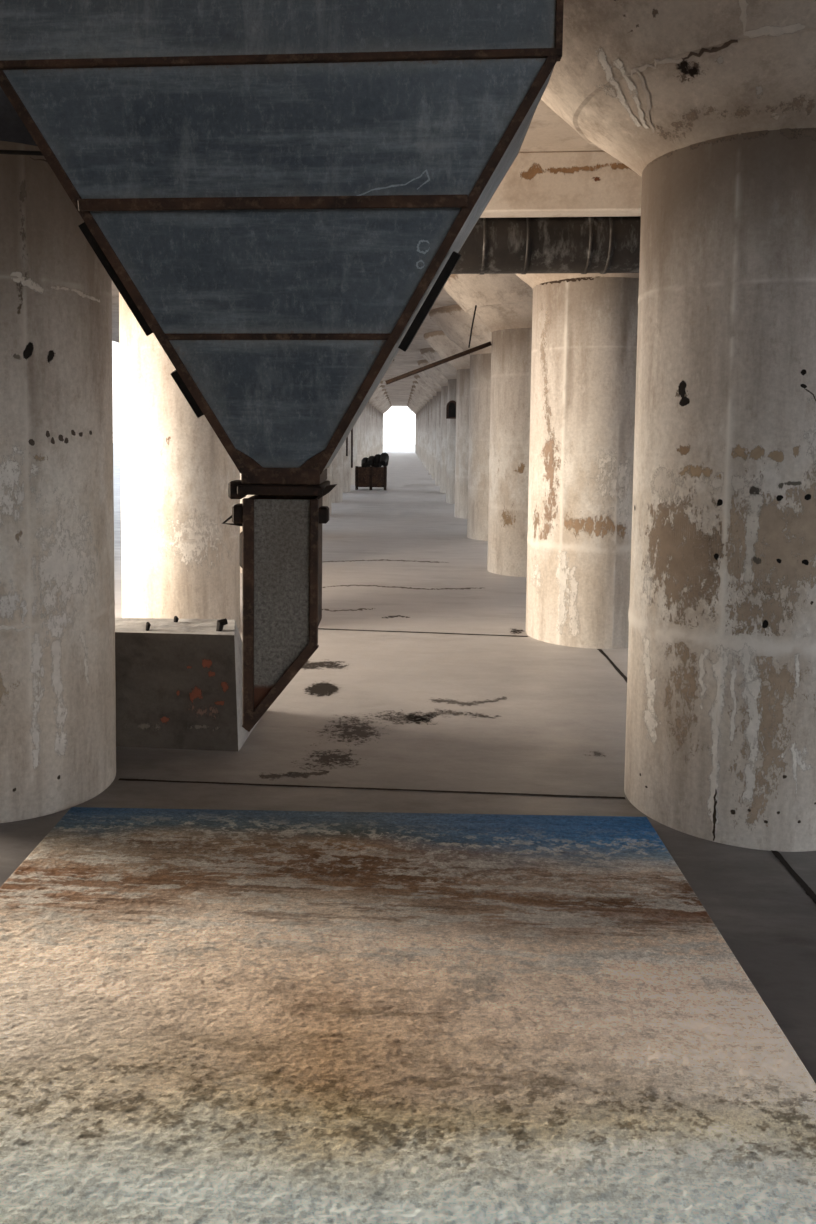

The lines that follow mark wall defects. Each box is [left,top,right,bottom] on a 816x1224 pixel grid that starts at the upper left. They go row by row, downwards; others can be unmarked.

crack [625,40,738,133]
peeling [29,430,92,465]
peeling [641,444,816,635]
water stain [291,696,507,778]